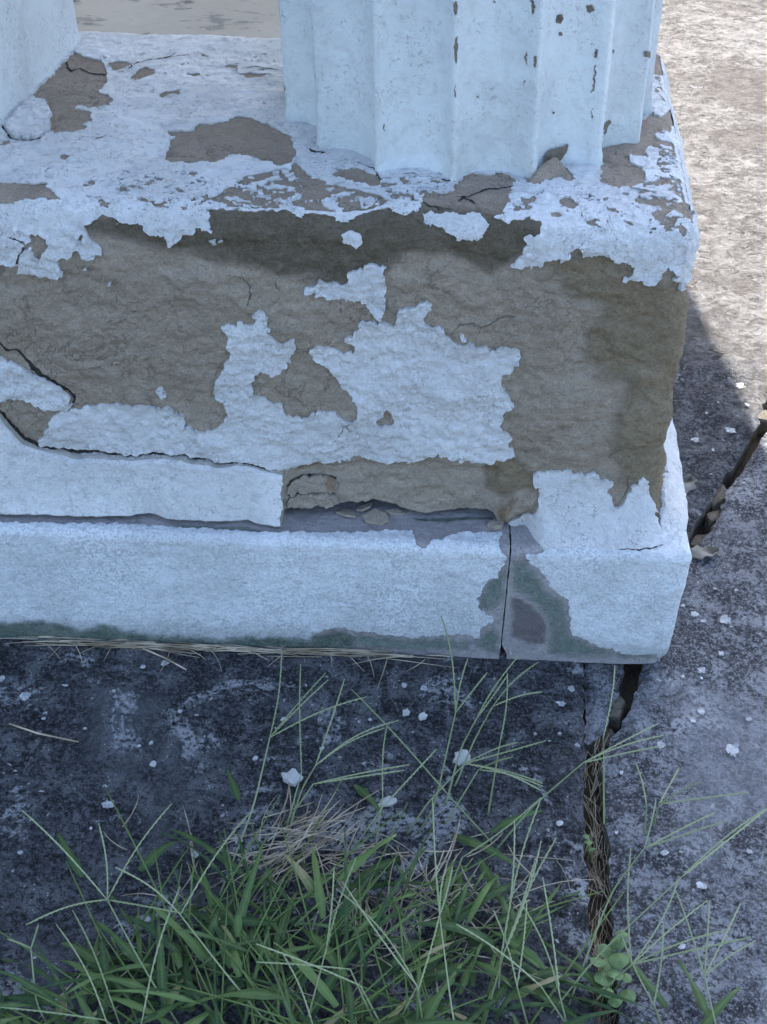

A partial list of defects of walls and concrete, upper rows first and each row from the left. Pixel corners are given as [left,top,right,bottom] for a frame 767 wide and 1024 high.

peeling [2,52,155,145]
peeling [226,65,266,78]
peeling [600,51,693,236]
peeling [655,268,679,288]
crack [0,343,76,406]
peeling [0,116,658,664]
crack [0,410,336,496]
damp [513,599,545,643]